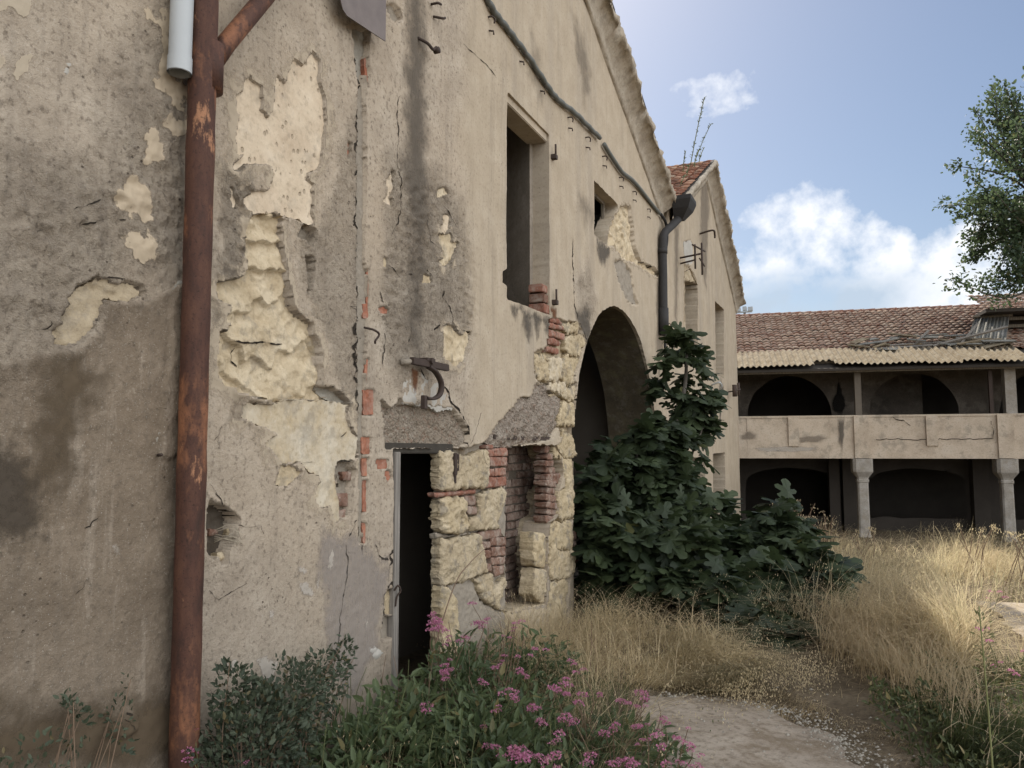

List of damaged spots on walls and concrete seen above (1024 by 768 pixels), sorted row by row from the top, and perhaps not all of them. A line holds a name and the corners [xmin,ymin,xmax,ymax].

peeling [113,7,187,264]
leakage [405,0,425,239]
peeling [383,175,393,205]
peeling [52,278,139,346]
spalling [209,40,359,535]
peeling [438,215,456,266]
peeling [443,325,468,366]
spalling [607,207,655,305]
leakage [0,358,92,534]
spalling [206,504,242,561]
crack [334,520,394,656]